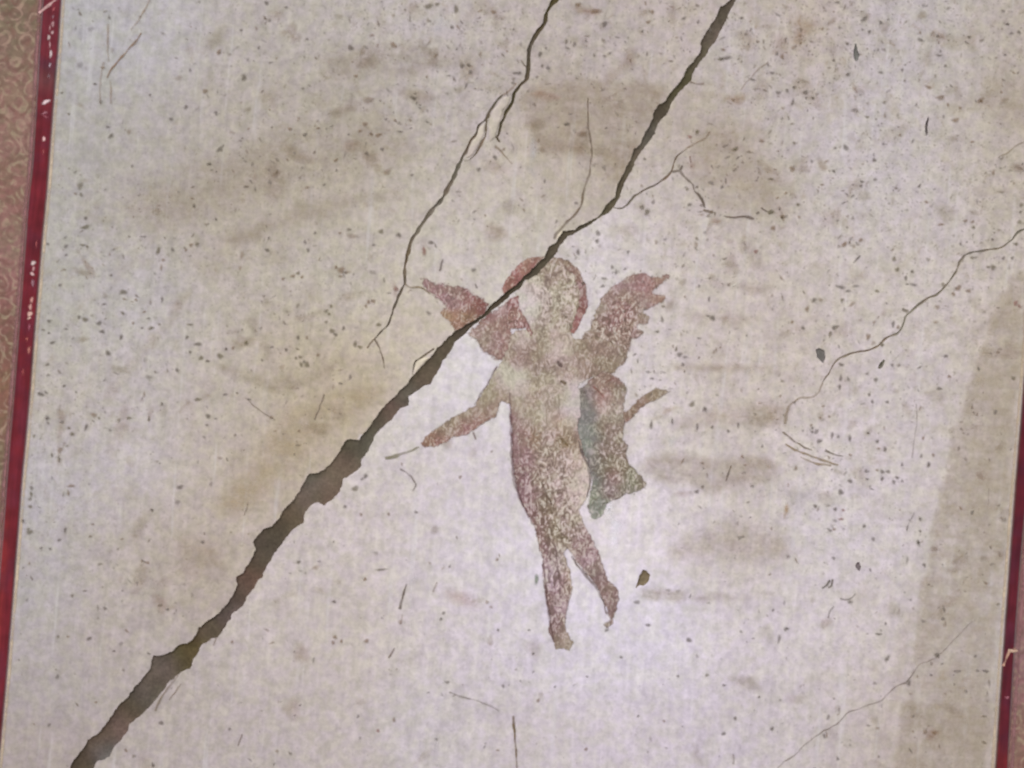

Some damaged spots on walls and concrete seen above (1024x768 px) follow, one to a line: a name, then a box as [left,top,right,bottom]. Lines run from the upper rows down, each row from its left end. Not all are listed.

crack [70,0,767,768]
crack [784,229,1024,424]